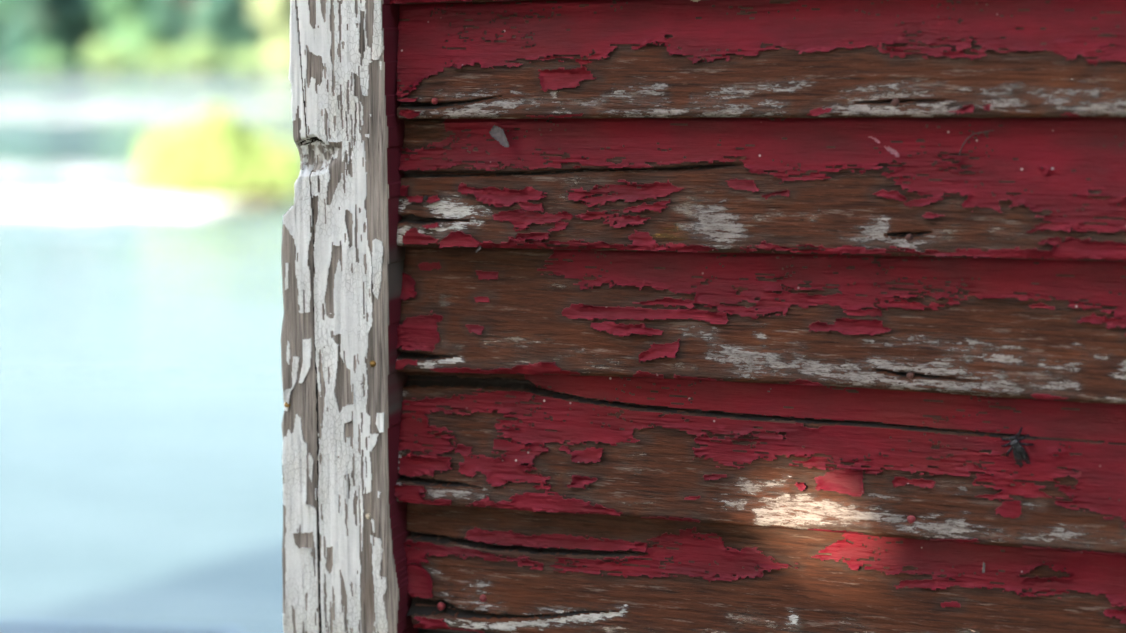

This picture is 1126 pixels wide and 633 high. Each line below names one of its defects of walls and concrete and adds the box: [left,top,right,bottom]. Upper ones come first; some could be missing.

crack [406,597,616,619]
peeling [282,0,1126,633]